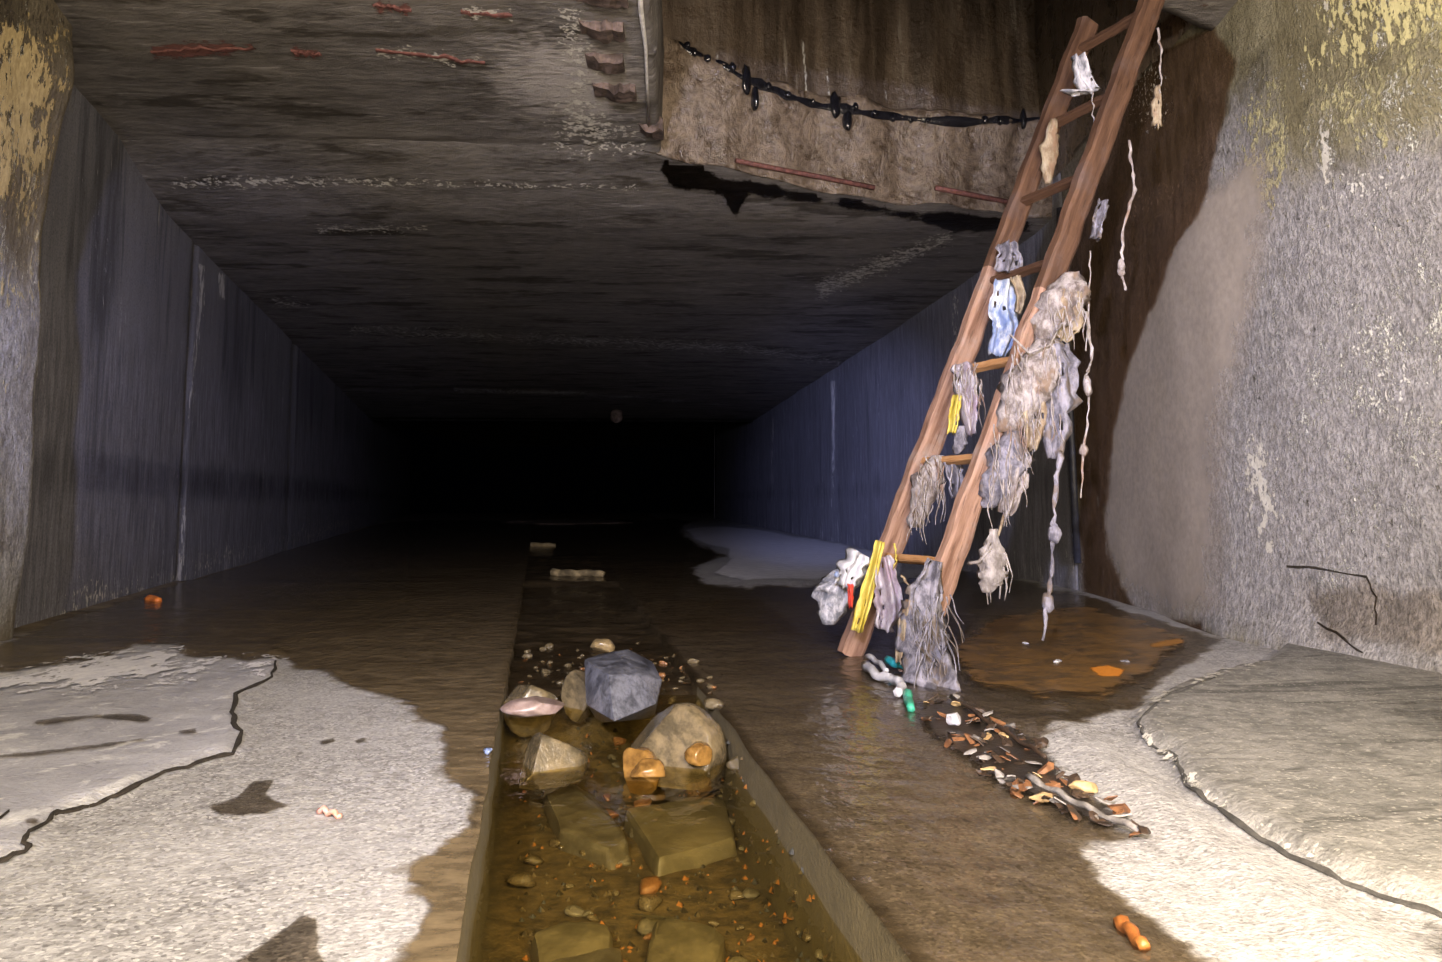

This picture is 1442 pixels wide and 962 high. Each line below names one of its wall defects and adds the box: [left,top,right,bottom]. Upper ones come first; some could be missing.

leakage [0,12,72,226]
spalling [735,158,875,190]
leakage [1316,108,1425,211]
leakage [1304,0,1442,72]
crack [0,660,277,863]
crack [1136,661,1442,919]